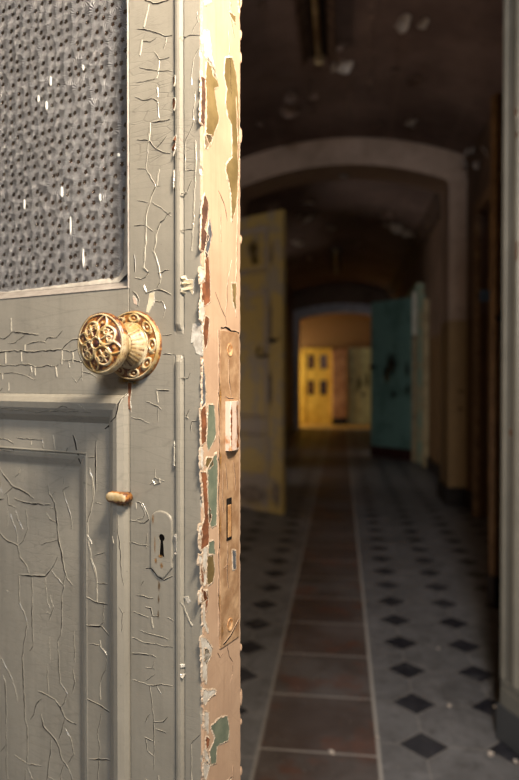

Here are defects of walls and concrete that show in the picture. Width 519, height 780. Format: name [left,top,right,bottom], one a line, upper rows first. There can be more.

crack [133,0,200,355]
peeling [198,29,242,224]
peeling [229,0,242,40]
peeling [329,43,353,75]
peeling [394,13,429,34]
crack [0,318,96,413]
crack [0,373,192,780]
peeling [180,192,230,780]